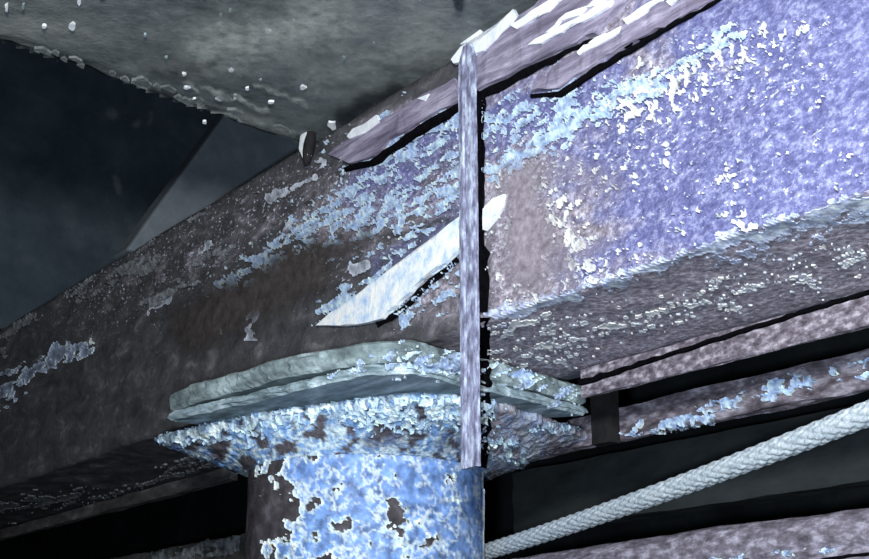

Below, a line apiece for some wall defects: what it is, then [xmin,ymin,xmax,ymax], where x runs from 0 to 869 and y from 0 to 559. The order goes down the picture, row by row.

spalling [34,46,85,69]
spalling [109,70,204,107]
peeling [63,235,164,304]
peeling [136,78,460,383]
peeling [451,0,869,438]
peeling [0,312,95,411]
peeling [0,393,461,524]
peeling [253,453,485,559]
peeling [480,393,533,469]